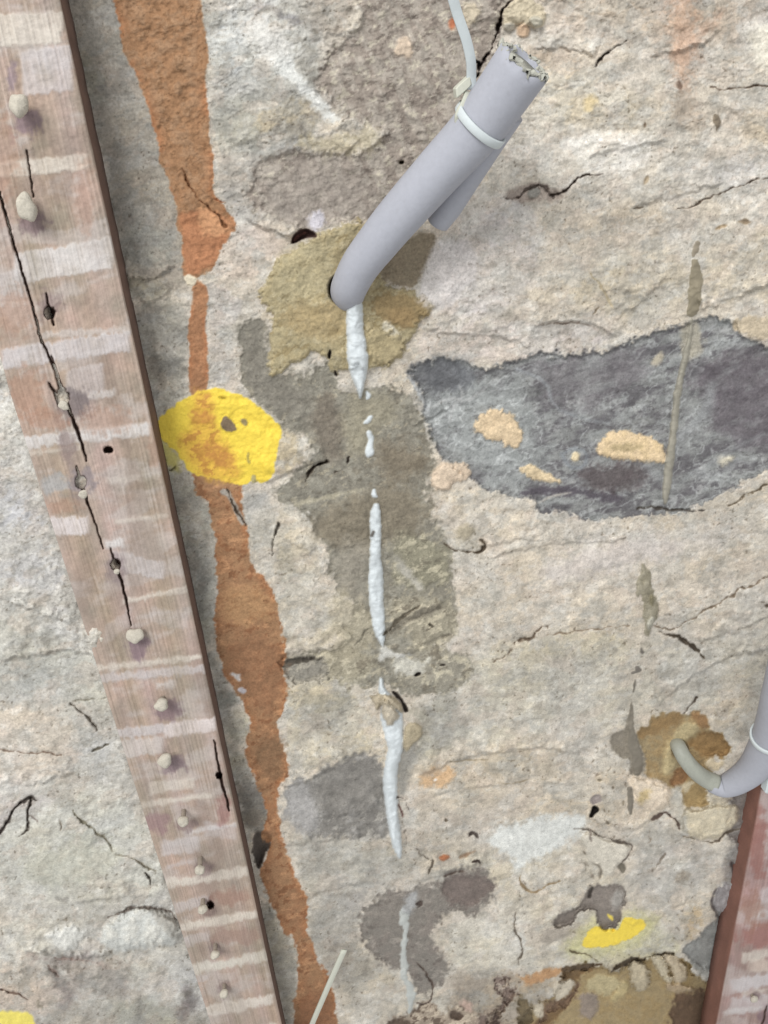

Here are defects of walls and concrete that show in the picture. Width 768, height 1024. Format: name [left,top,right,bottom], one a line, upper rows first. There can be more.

crack [590,40,627,69]
crack [501,173,604,209]
crack [676,176,768,211]
rust [111,0,339,1024]
crack [492,575,768,663]
crack [68,697,111,753]
crack [0,794,178,922]
crack [47,956,99,980]